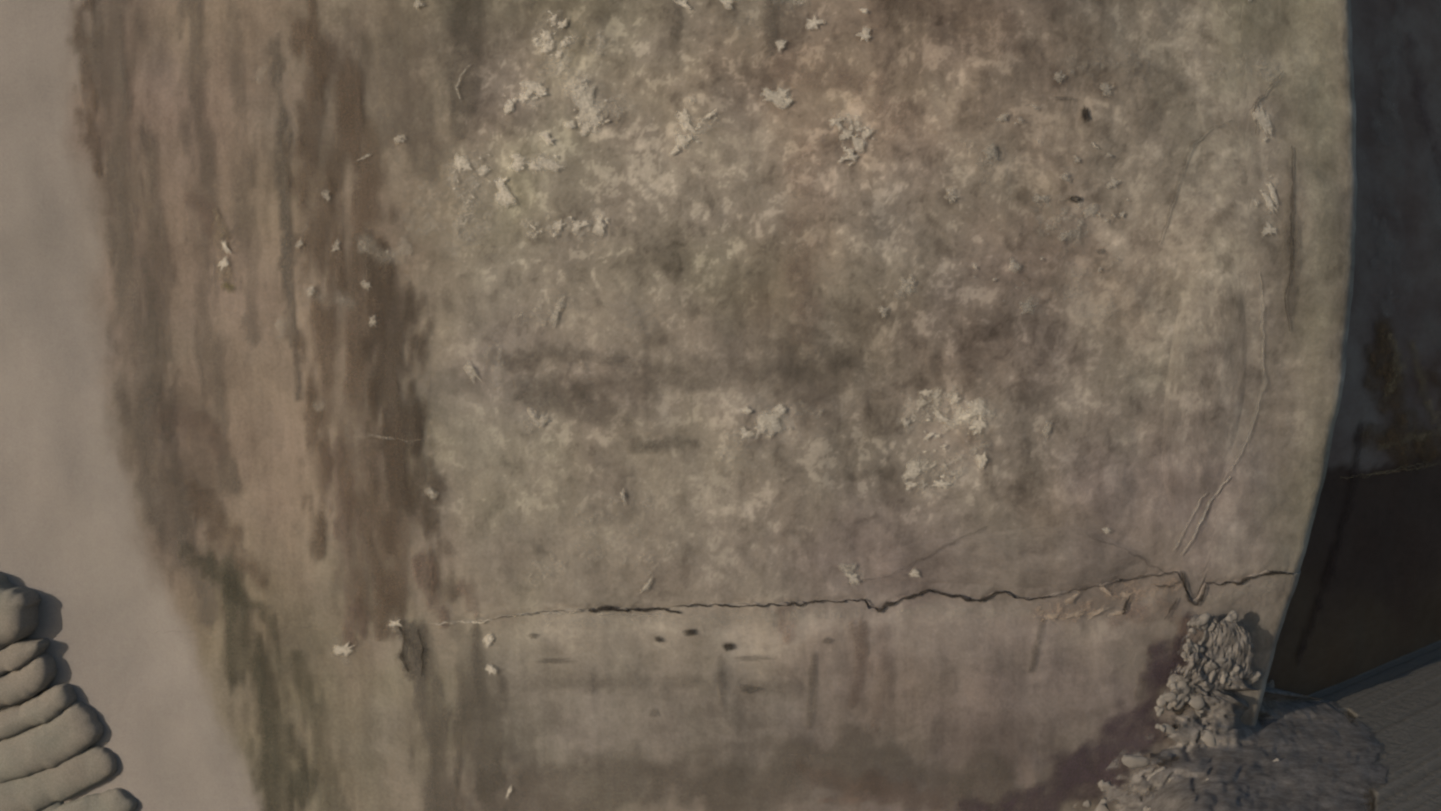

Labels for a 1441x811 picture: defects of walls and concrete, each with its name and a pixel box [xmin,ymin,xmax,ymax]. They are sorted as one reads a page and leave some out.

water stain [94,109,307,811]
crack [425,571,1293,625]